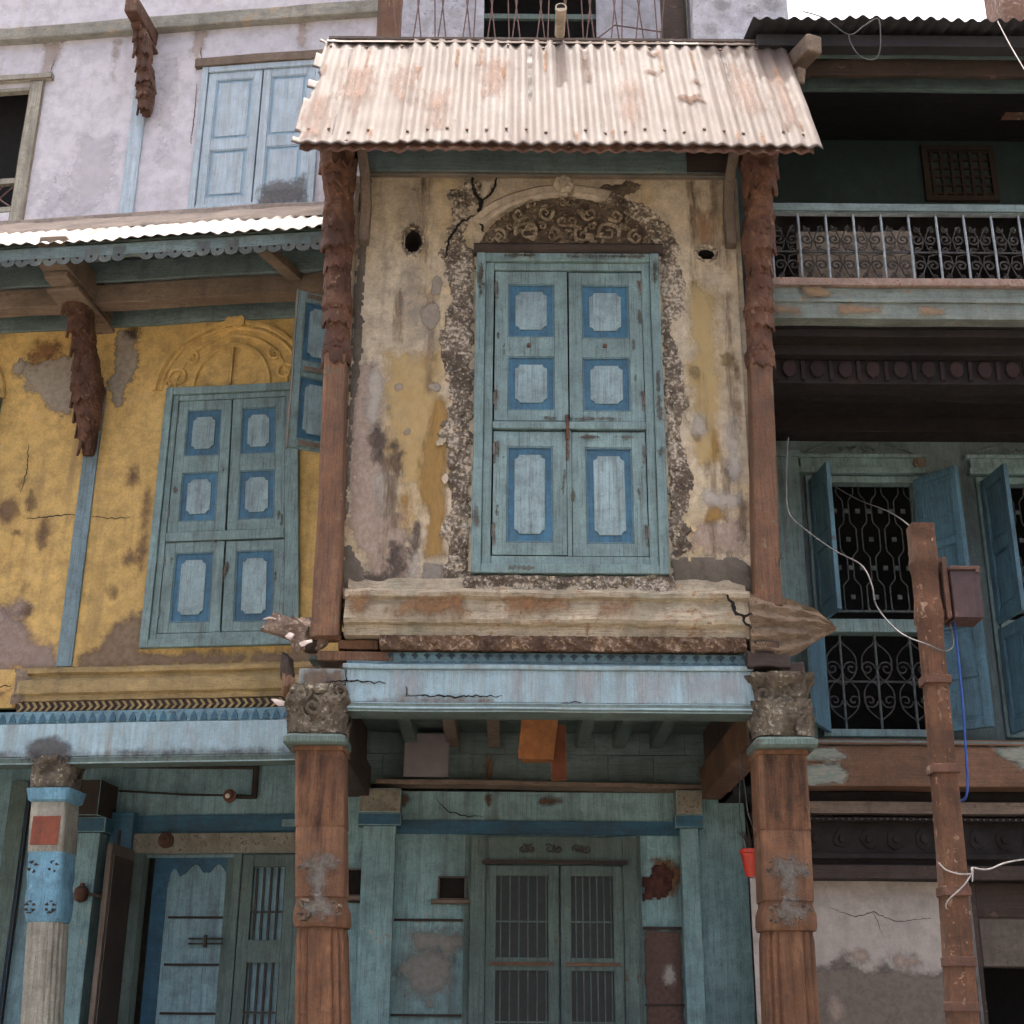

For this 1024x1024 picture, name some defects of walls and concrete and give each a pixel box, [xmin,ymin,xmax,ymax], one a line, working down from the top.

corrosion [678,51,706,103]
mould [258,175,306,204]
crack [445,177,497,258]
peeling [12,355,74,415]
flaking render [419,178,494,578]
flaking render [567,180,701,562]
leakage [346,332,447,581]
crack [27,512,126,520]
crack [726,594,753,629]
crack [325,671,502,699]
peeling [806,747,848,786]
corrosion [651,858,681,896]